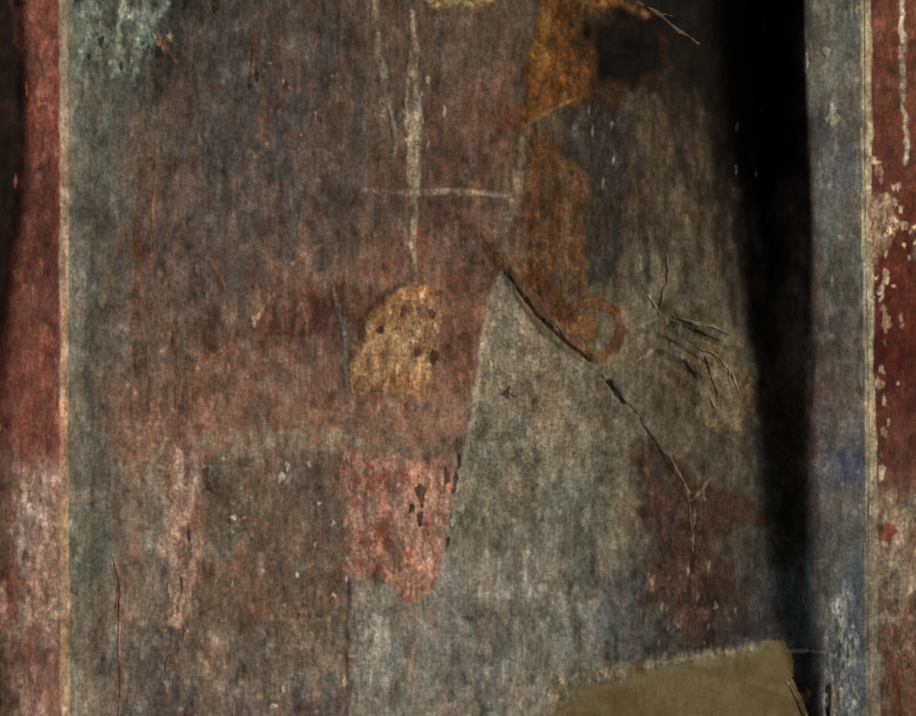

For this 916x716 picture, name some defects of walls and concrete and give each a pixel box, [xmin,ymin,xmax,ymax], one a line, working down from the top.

peeling [867,156,916,262]
peeling [868,268,904,345]
crack [474,233,711,552]
peeling [874,365,886,406]
peeling [878,451,886,482]
crack [792,677,830,716]